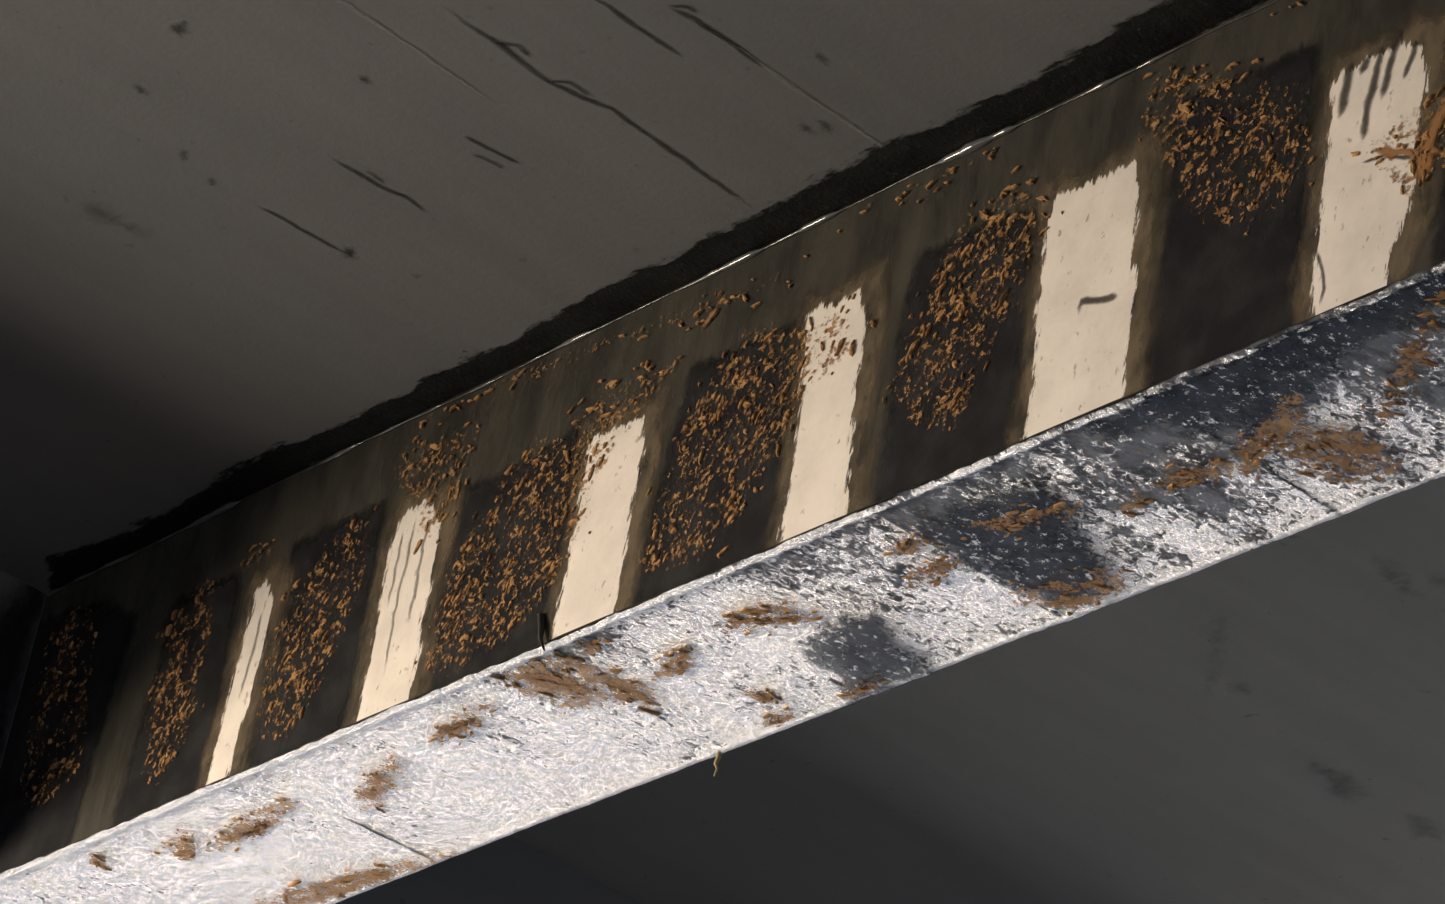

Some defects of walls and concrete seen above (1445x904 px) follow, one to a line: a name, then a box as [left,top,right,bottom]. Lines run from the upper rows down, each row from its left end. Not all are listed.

crack [265,210,336,249]
crack [339,163,422,210]
rust [394,271,792,676]
crack [463,22,733,195]
damp [544,397,666,642]
crack [595,0,759,65]
rust [638,293,856,572]
damp [769,263,888,547]
rust [882,165,1064,431]
damp [1010,132,1166,443]
rust [1138,58,1315,237]
damp [1294,15,1445,322]